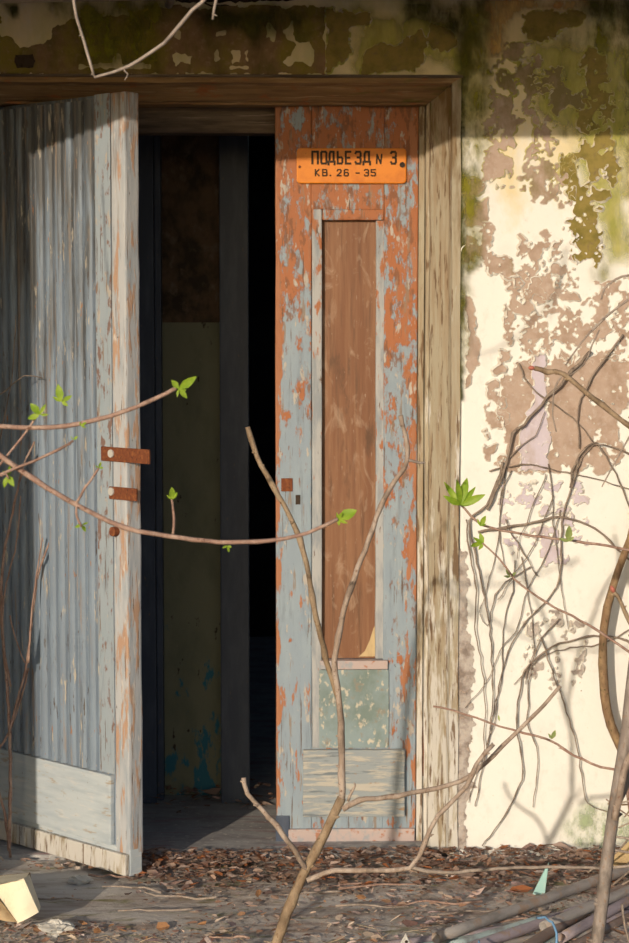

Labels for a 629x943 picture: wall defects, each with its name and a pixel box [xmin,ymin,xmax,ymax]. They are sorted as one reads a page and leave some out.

peeling [0,4,459,75]
peeling [461,8,629,568]